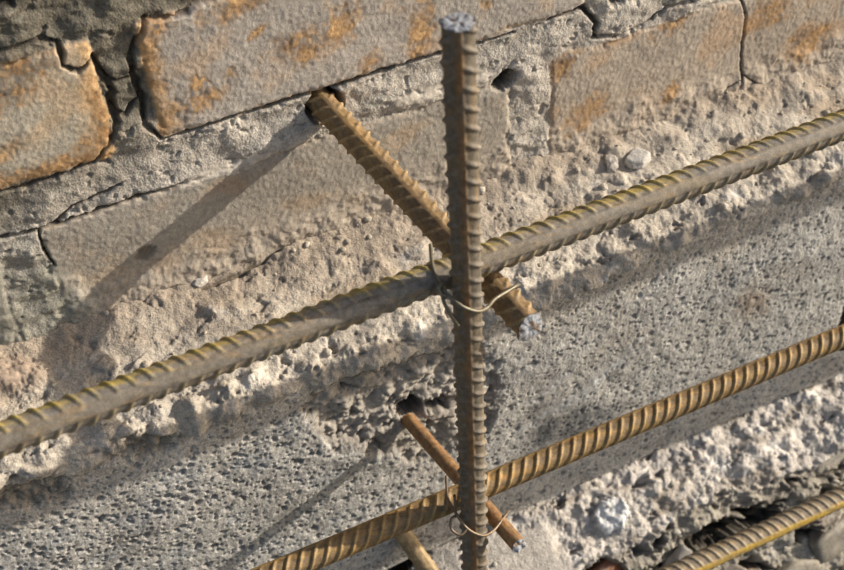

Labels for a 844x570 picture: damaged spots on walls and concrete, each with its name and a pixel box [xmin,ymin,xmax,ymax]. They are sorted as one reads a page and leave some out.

crack [724,35,755,91]
spalling [303,347,458,461]
spalling [483,372,498,424]
spalling [122,434,162,451]
spalling [0,477,63,505]
spalling [734,507,770,525]
spalling [683,522,716,546]